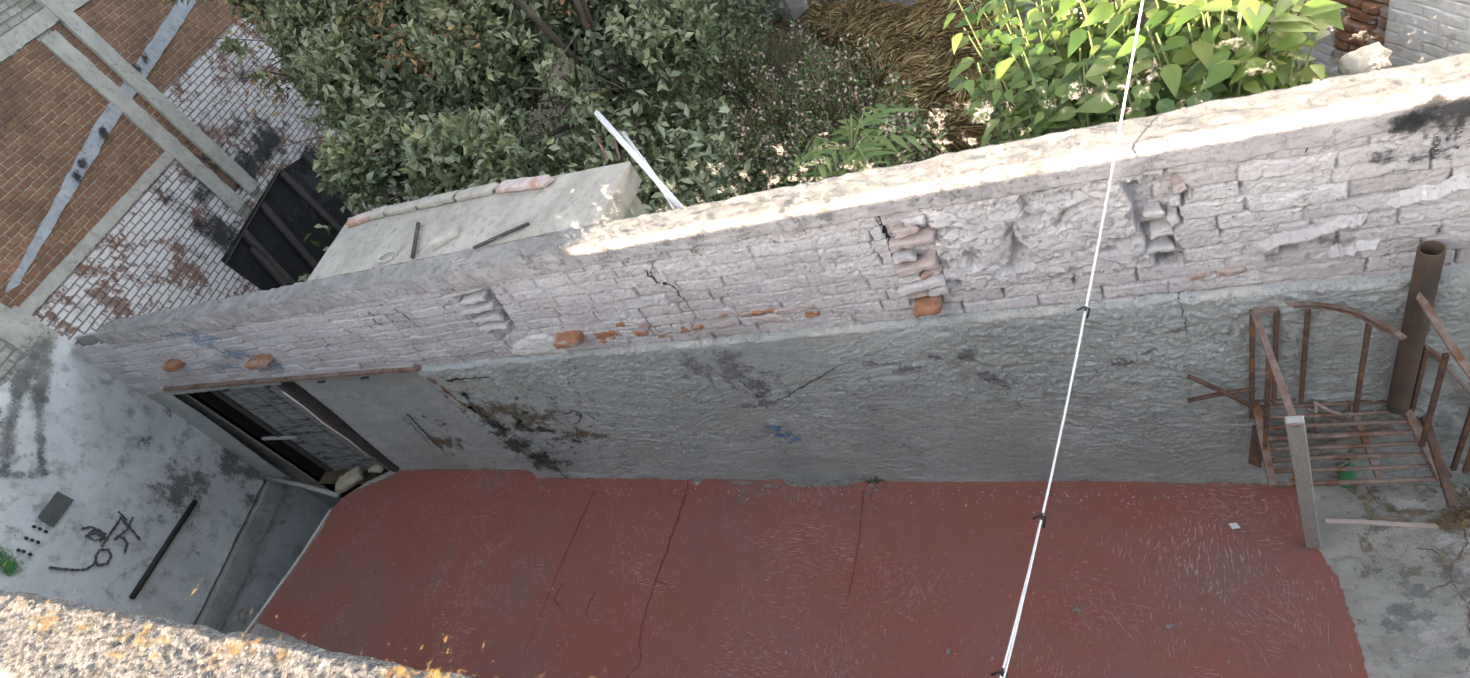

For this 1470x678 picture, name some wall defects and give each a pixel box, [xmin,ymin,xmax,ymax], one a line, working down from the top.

peeling [888,173,1187,300]
spalling [460,289,512,332]
spalling [592,304,820,343]
leakage [792,320,907,339]
leakage [967,301,1104,323]
leakage [1160,281,1295,304]
leakage [422,415,467,467]
leakage [467,380,609,475]
crack [625,481,689,678]
crack [1416,511,1470,632]